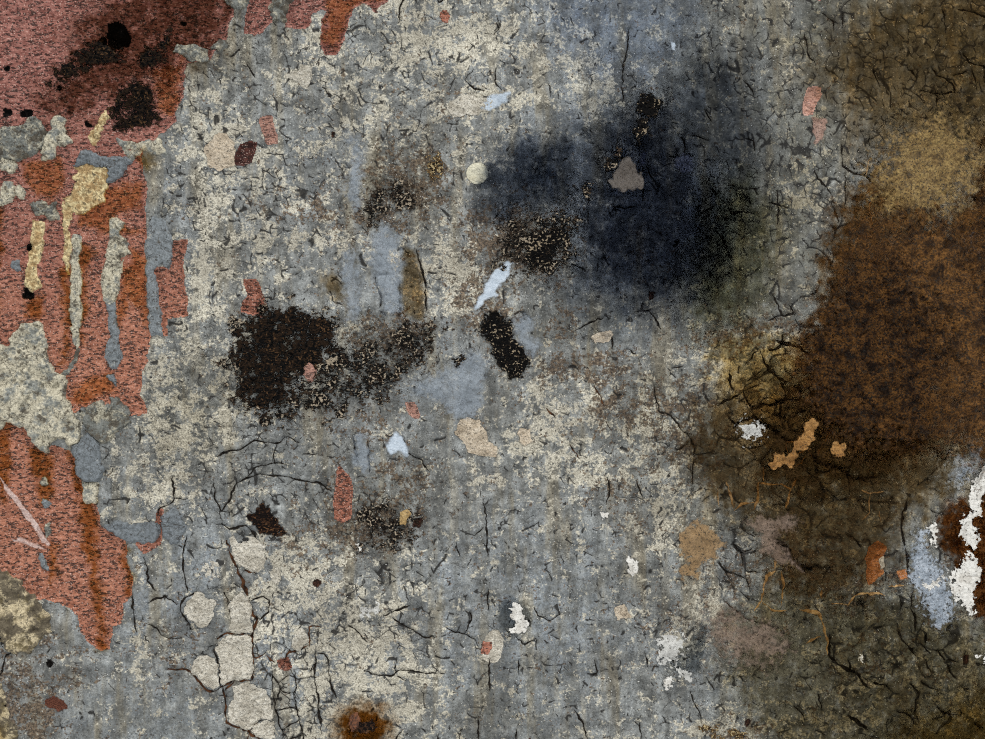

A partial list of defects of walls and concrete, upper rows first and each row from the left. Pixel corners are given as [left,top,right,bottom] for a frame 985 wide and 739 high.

spalling [285,0,388,55]
spalling [0,0,278,416]
corrosion [768,101,985,470]
crack [718,296,826,441]
spalling [0,422,187,651]
crack [131,537,197,639]
crack [165,436,337,739]
spalling [229,536,281,584]
corrosion [335,703,392,739]
crack [366,662,444,681]
crack [828,501,982,737]
corrosion [937,492,985,618]